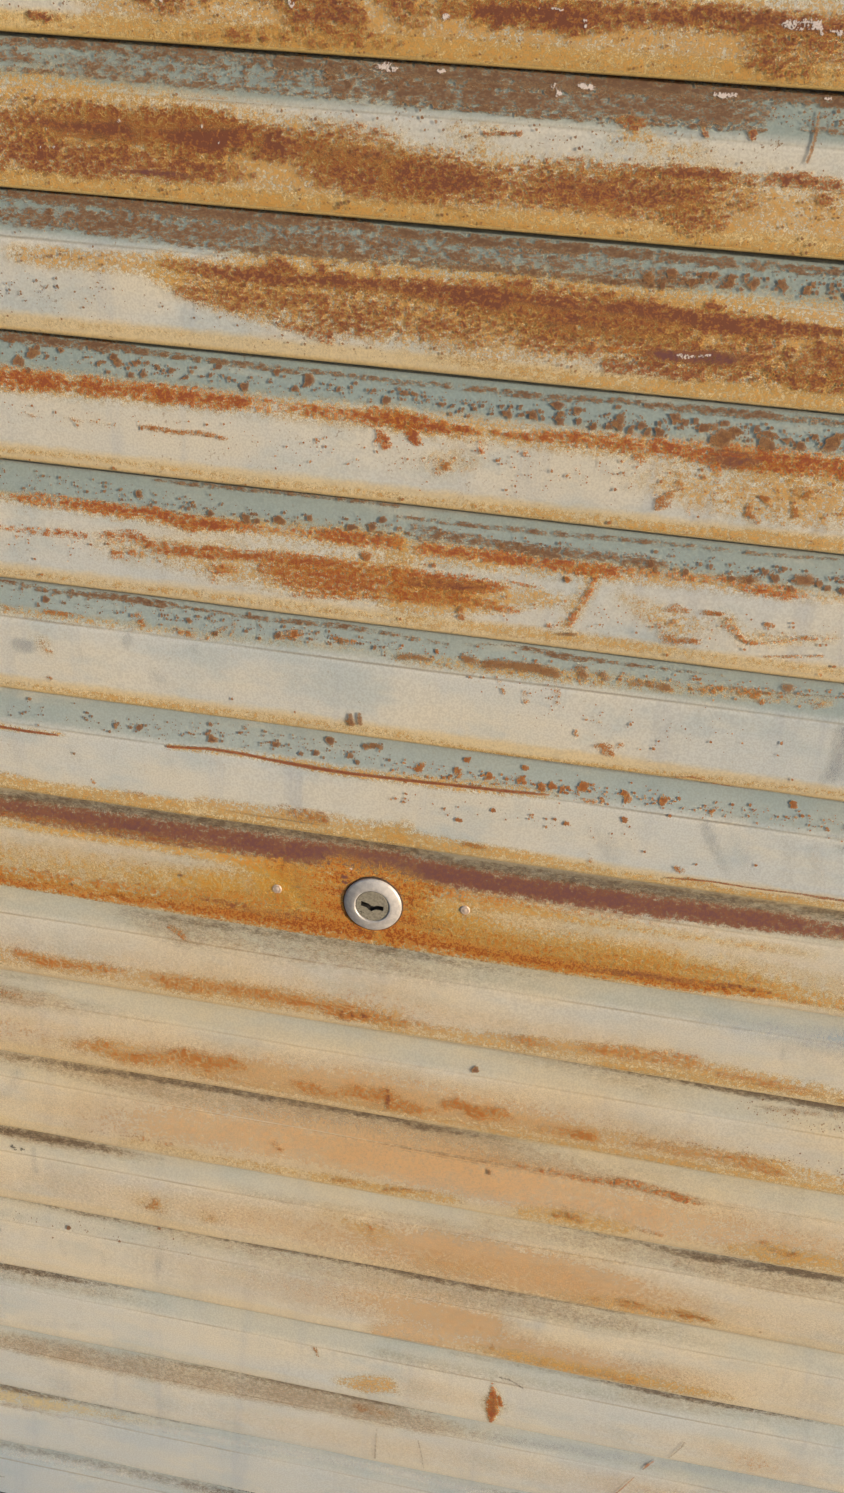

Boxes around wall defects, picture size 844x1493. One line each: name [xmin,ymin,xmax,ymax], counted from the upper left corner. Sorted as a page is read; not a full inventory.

corrosion [0,0,844,853]
corrosion [0,773,844,1009]
corrosion [486,1383,503,1423]